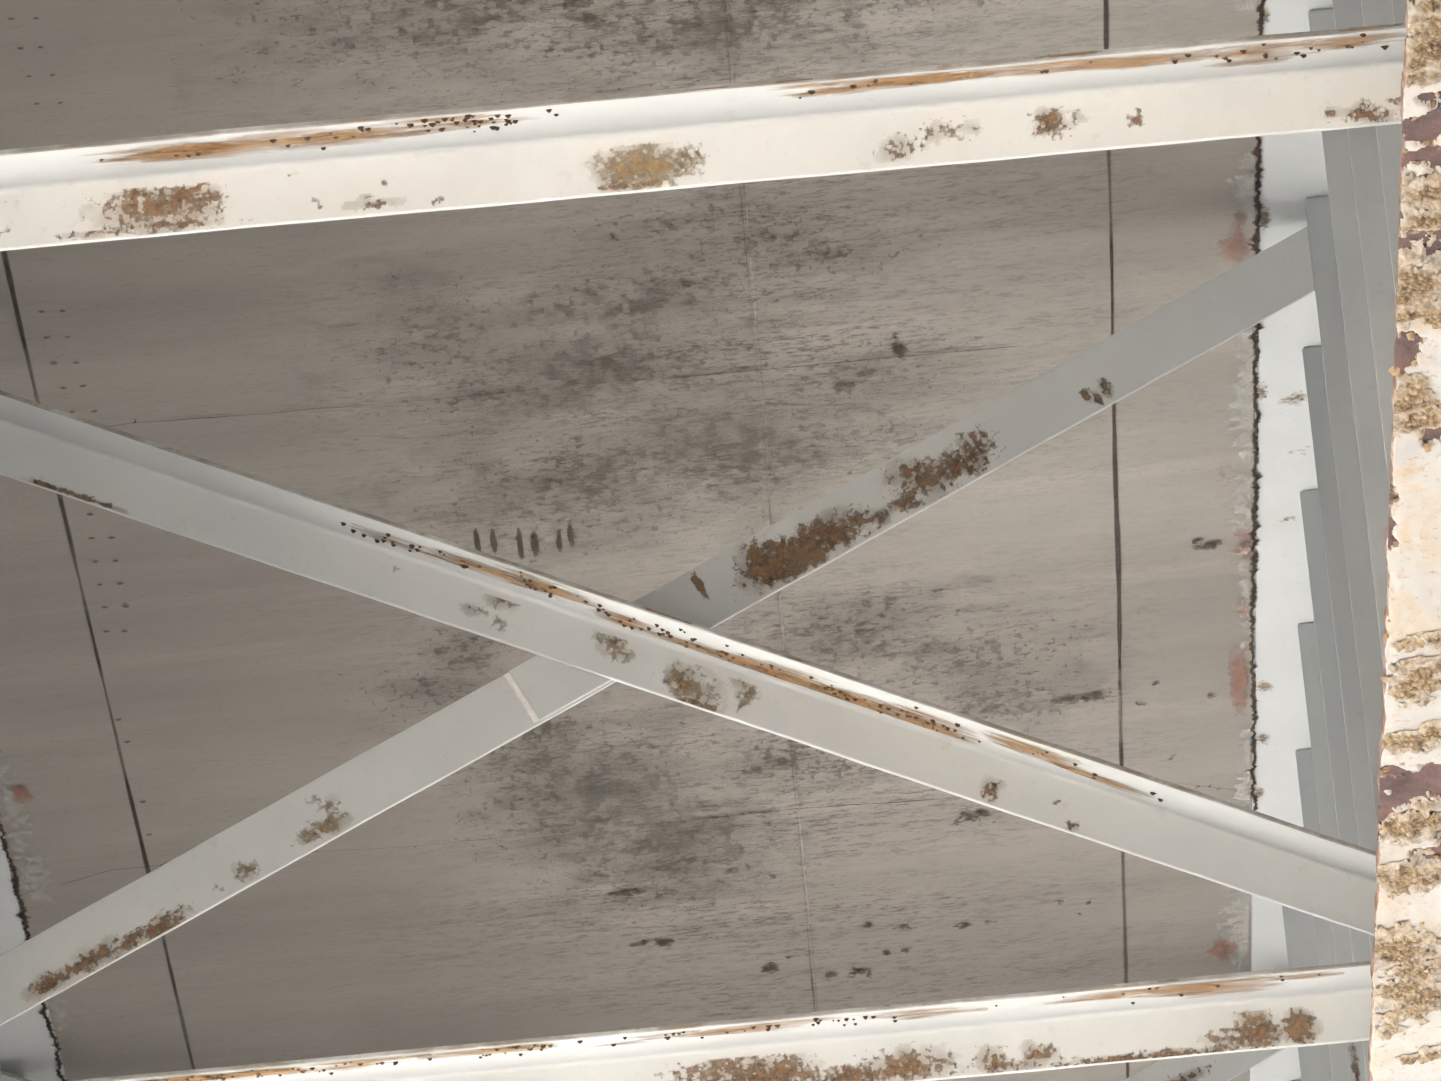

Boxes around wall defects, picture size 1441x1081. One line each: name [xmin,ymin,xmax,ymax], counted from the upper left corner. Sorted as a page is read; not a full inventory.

corrosion [776,23,1402,99]
peeling [1405,0,1441,88]
corrosion [100,114,518,161]
corrosion [1325,91,1441,176]
peeling [1396,171,1441,331]
peeling [1393,372,1441,438]
corrosion [733,429,996,595]
corrosion [341,522,1163,802]
peeling [1380,630,1441,756]
peeling [1377,795,1441,900]
peeling [1372,921,1441,1041]
corrosion [661,1008,1317,1081]